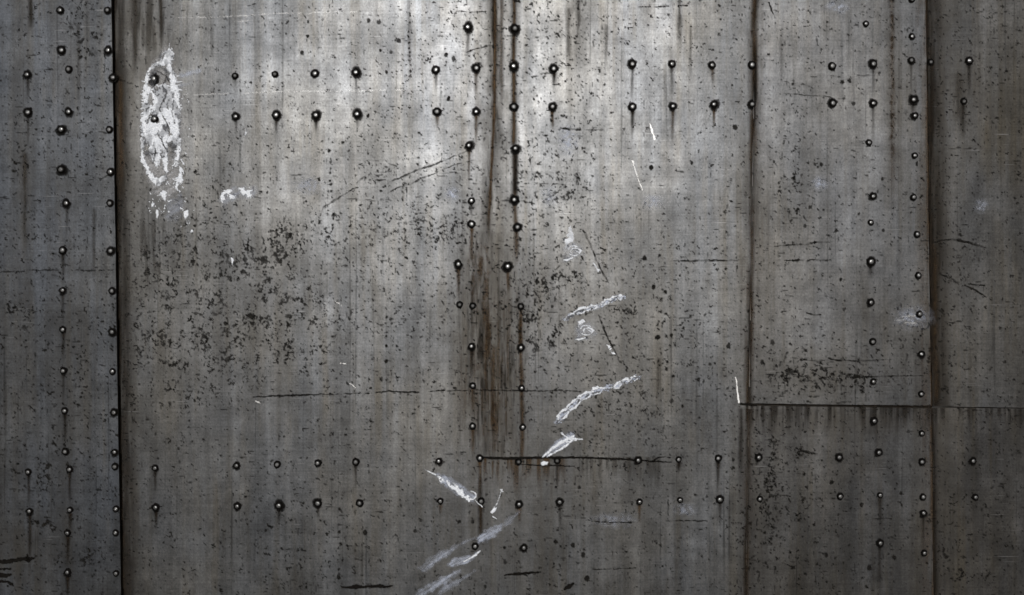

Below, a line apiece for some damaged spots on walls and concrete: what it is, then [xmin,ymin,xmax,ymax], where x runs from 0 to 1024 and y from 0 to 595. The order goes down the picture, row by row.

corrosion [487,0,498,216]